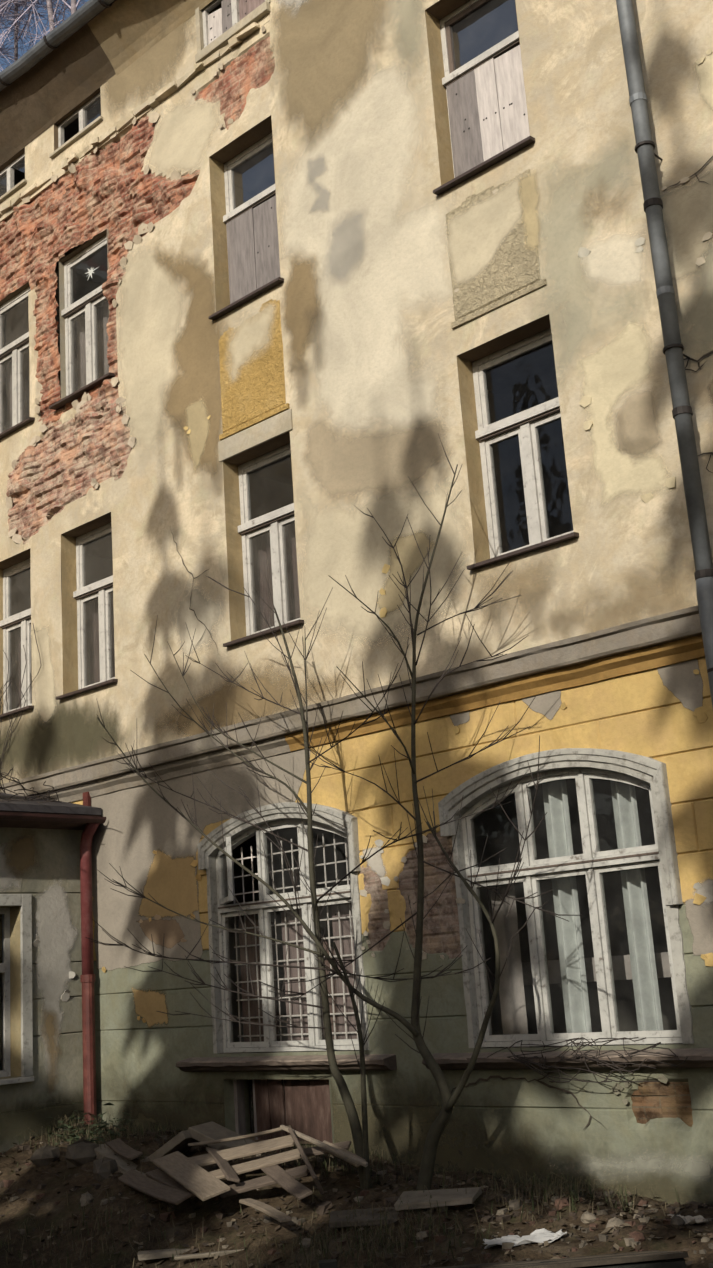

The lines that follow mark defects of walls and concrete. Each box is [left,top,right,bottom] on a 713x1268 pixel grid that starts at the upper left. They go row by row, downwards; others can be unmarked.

flaking render [190,26,275,130]
crack [665,156,713,190]
flaking render [0,112,200,545]
water stain [158,256,224,475]
crack [684,350,713,372]
peeling [184,400,211,466]
water stain [0,628,122,779]
peeling [33,884,77,1074]
peeling [91,747,310,973]
flaking render [359,831,465,960]
peeling [685,880,713,967]
flaking render [611,1074,693,1127]